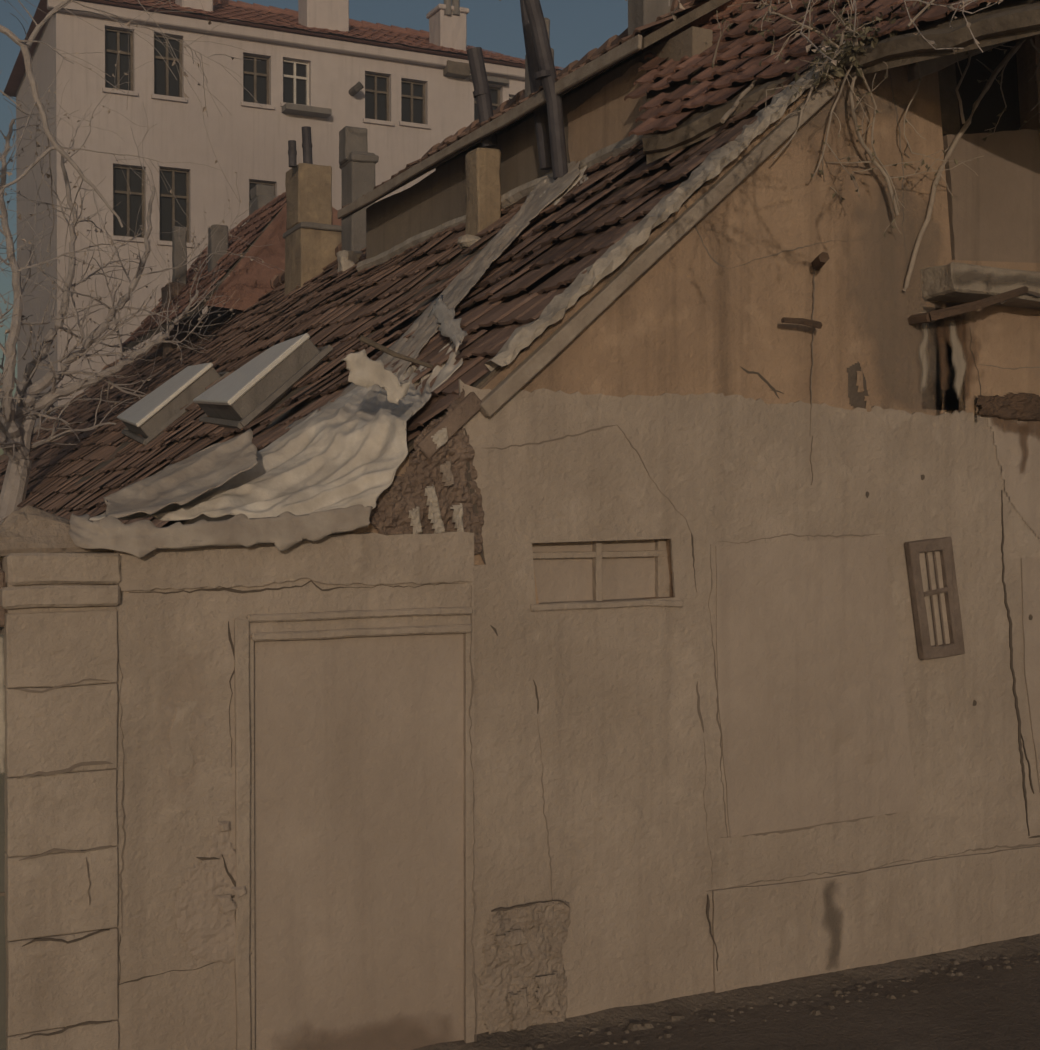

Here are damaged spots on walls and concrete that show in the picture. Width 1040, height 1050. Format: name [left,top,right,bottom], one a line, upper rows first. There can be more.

spalling [369,386,485,555]
crack [13,659,235,985]
crack [116,425,1040,1041]
crack [20,1021,112,1040]